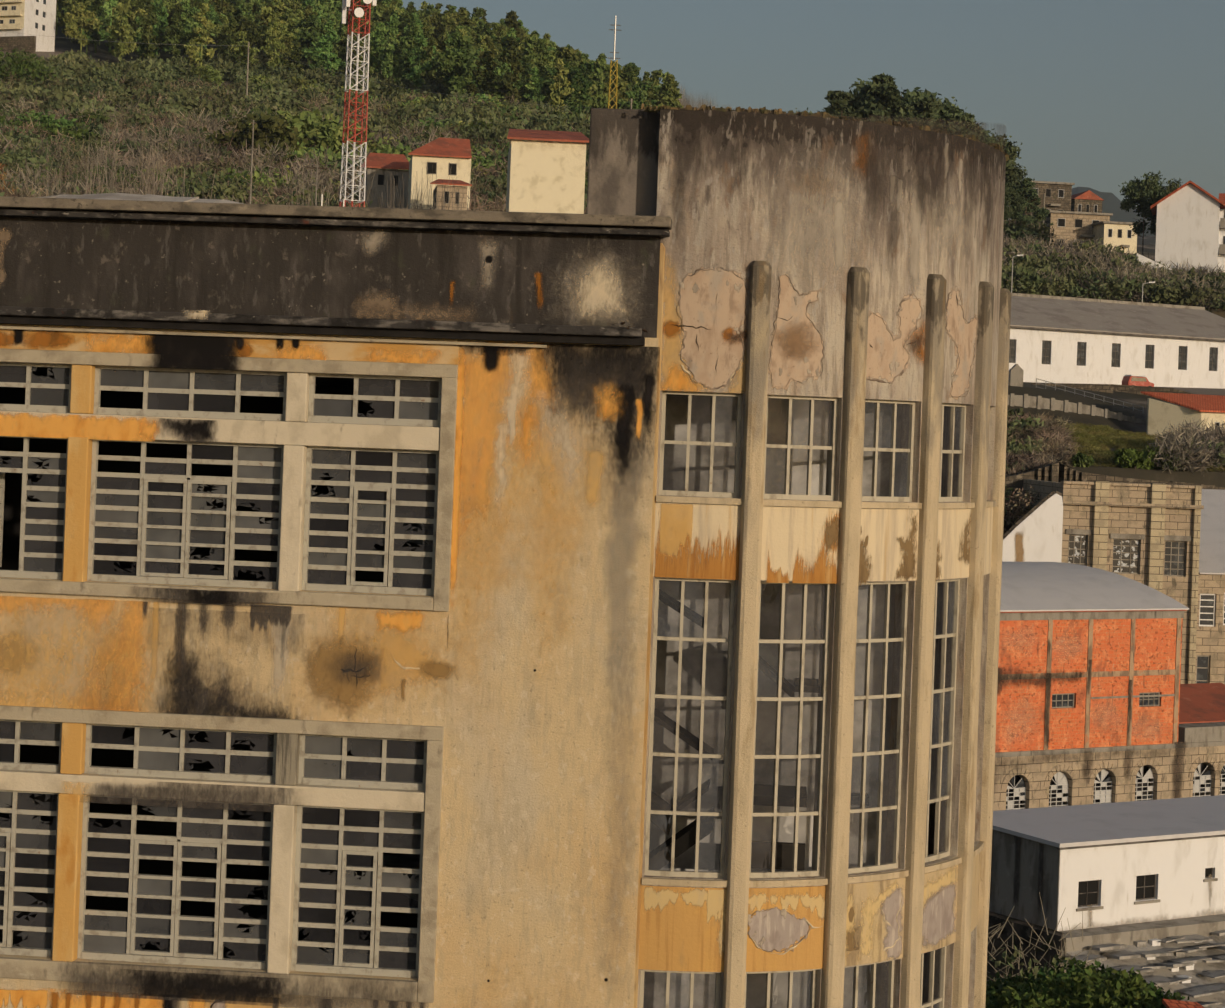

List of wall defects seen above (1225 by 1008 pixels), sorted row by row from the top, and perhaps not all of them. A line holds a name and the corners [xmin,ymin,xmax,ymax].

water stain [944,143,963,193]
spalling [610,267,748,393]
spalling [768,274,825,390]
water stain [460,345,529,493]
water stain [560,372,654,468]
peeling [654,504,740,580]
peeling [767,511,840,584]
peeling [859,527,871,585]
peeling [894,516,917,581]
water stain [143,587,292,708]
spalling [748,892,826,955]
water stain [70,966,424,1008]